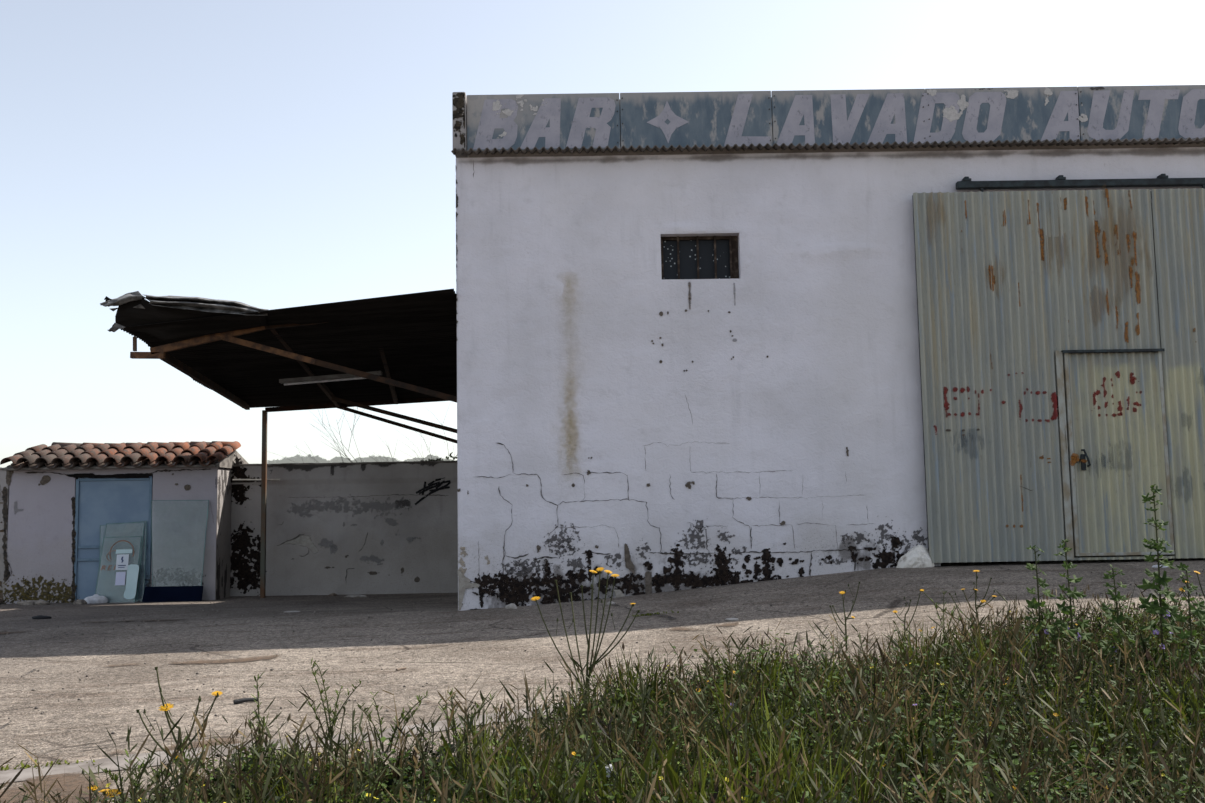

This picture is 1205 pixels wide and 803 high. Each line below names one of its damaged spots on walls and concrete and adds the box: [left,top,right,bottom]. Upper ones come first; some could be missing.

peeling [943,94,969,122]
rust [1027,200,1044,261]
rust [1085,188,1141,343]
spalling [0,465,14,586]
water stain [458,520,805,610]
crack [471,396,873,583]
water stain [819,516,928,569]